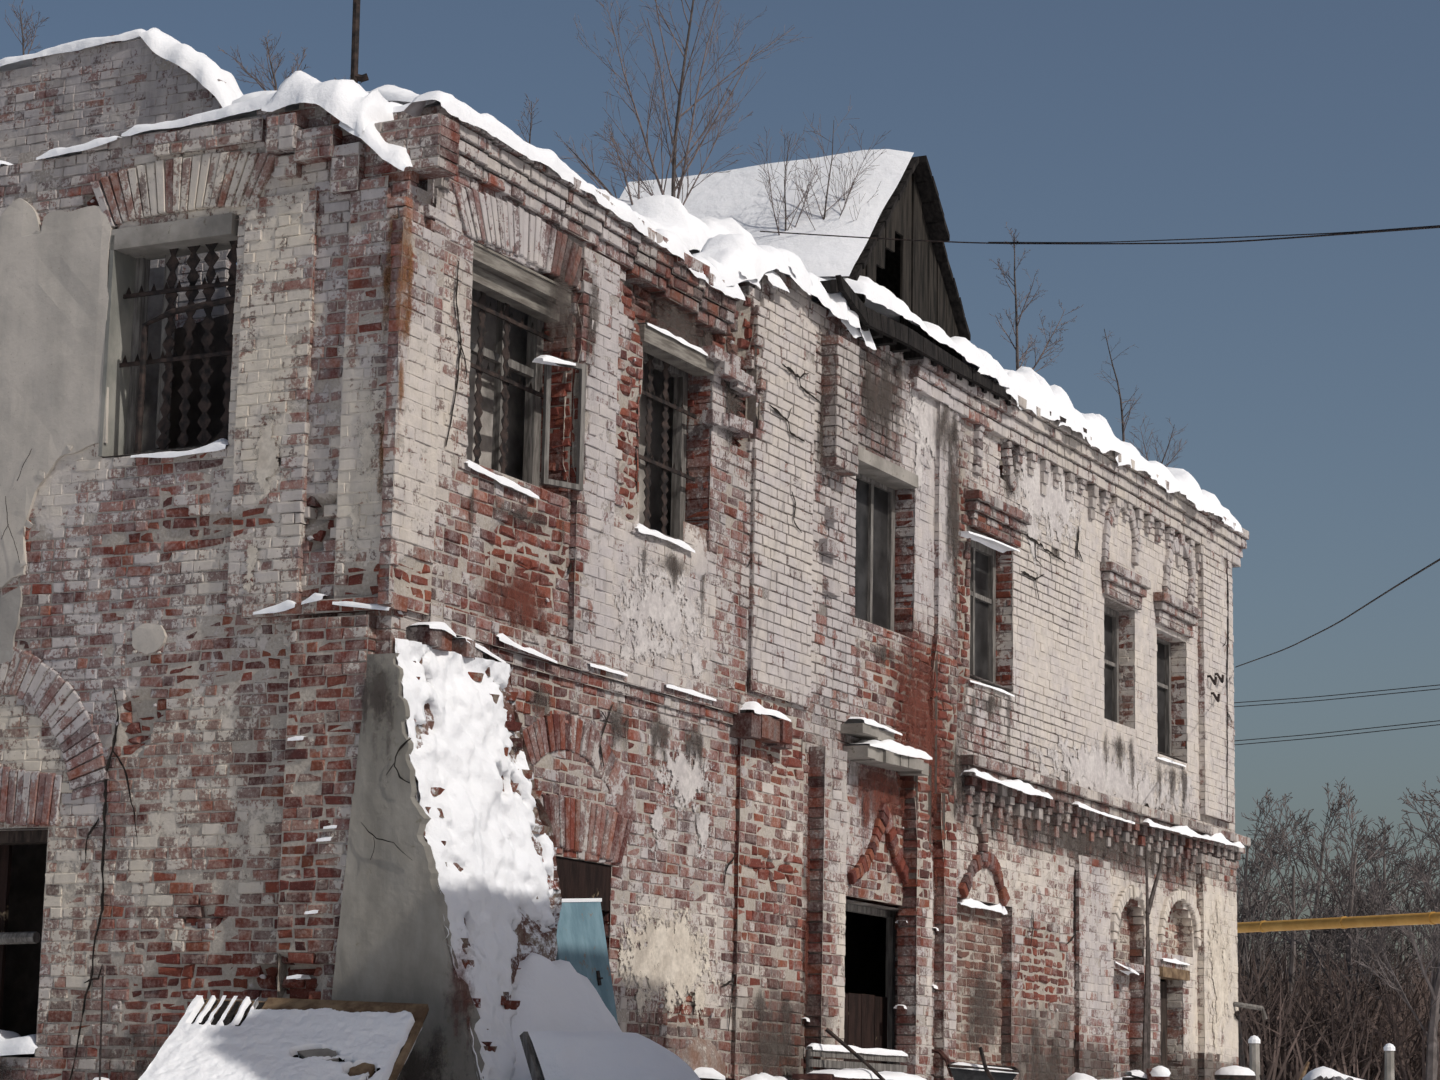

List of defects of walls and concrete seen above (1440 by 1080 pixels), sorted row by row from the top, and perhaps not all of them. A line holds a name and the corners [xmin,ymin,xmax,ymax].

flaking render [0,196,114,589]
crack [445,261,467,446]
crack [757,364,820,442]
crack [1,449,32,563]
spalling [129,385,284,593]
crack [791,491,802,533]
crack [386,738,411,783]
peeling [636,731,721,864]
water stain [1104,738,1135,779]
water stain [1158,765,1187,804]
spalling [105,955,323,1035]
peeling [608,894,723,1028]